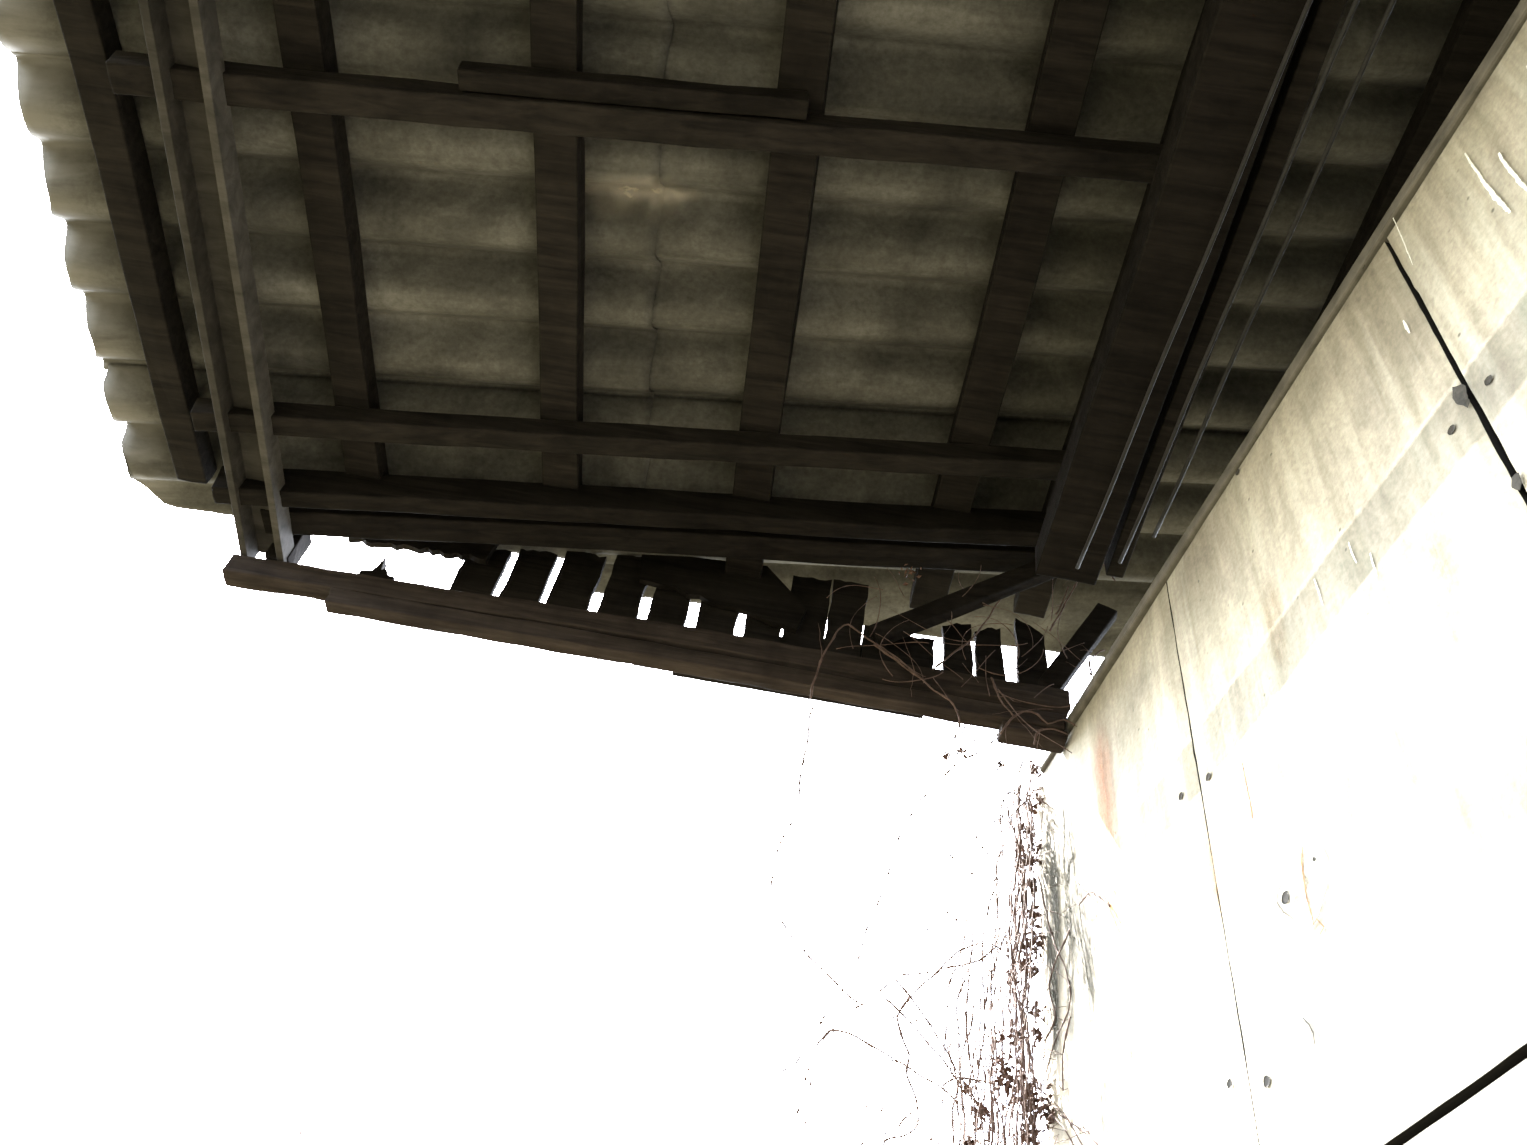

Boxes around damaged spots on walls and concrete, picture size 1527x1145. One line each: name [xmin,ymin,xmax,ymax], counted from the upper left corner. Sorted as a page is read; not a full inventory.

damp [1041,781,1105,1133]